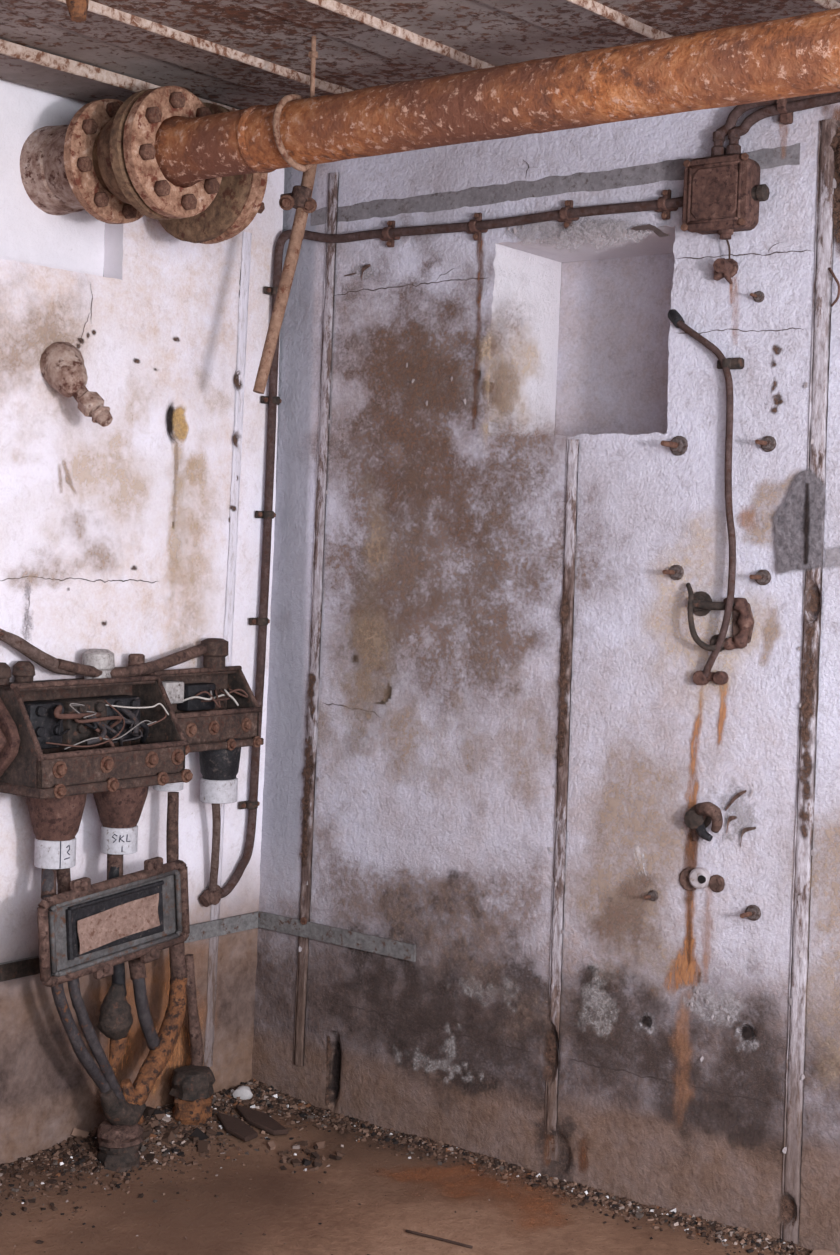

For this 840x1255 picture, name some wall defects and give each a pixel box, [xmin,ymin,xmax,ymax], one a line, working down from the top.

crack [2,576,157,629]
damp [325,283,597,769]
rust [688,692,702,811]
rust [718,683,728,744]
damp [330,859,550,1105]
damp [579,760,684,969]
damp [572,968,777,1151]
rust [665,891,707,990]
rust [685,833,697,869]
damp [810,826,840,1075]